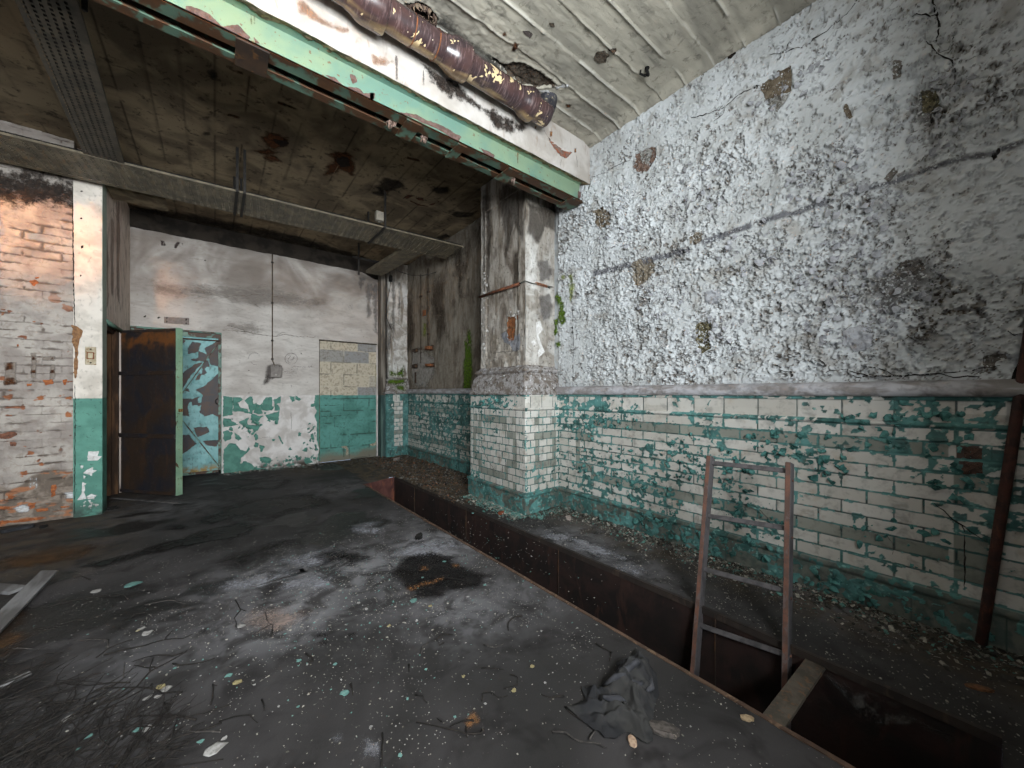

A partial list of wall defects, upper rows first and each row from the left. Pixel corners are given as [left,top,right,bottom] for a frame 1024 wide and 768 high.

spalling [497,61,556,87]
flaking render [747,55,831,115]
crack [912,0,956,80]
flaking render [632,147,656,173]
flaking render [592,186,688,319]
flaking render [27,325,83,386]
spalling [0,432,17,446]
peeling [223,395,320,473]
peeling [745,400,966,485]
spalling [0,451,102,524]
peeling [556,406,784,563]
spalling [363,477,1004,768]